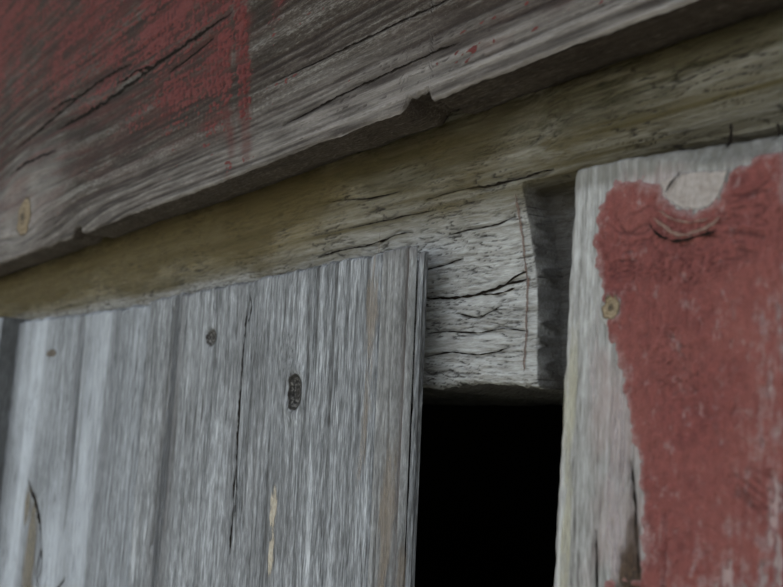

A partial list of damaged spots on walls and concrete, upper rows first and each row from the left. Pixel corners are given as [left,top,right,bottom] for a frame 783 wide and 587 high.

crack [9,12,232,177]
peeling [0,0,253,155]
crack [229,298,252,552]
crack [427,348,506,357]
crack [427,271,526,334]
peeling [592,152,783,587]
crack [28,481,42,587]